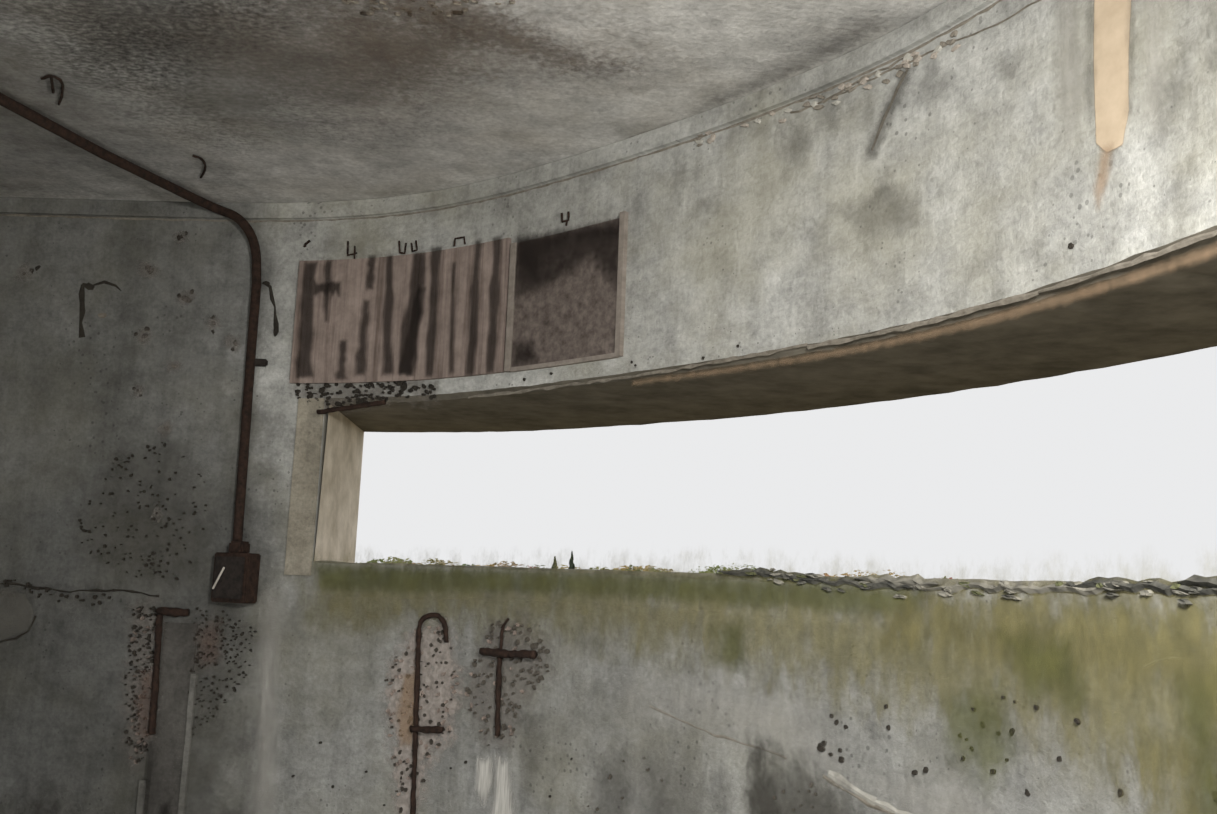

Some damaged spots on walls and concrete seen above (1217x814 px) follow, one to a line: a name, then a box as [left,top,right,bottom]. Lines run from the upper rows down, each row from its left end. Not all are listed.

spalling [3,579,115,606]
spalling [124,606,257,763]
spalling [383,613,550,814]
damp [476,757,512,814]